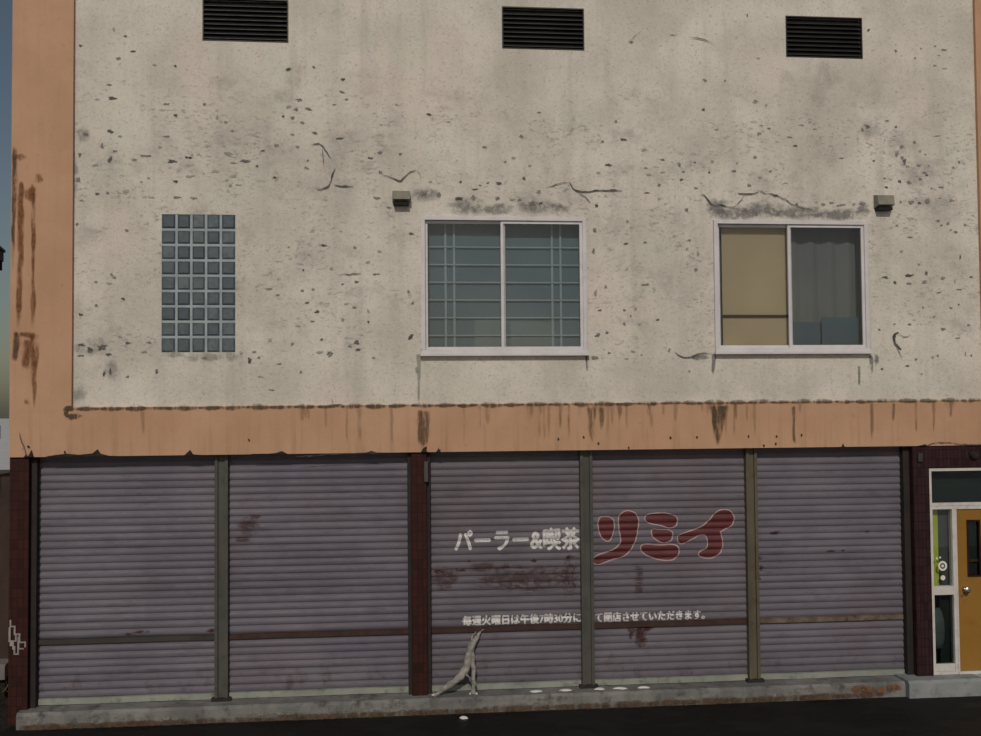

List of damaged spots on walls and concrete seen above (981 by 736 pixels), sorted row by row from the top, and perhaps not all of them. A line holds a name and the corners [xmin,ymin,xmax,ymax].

crack [311,143,353,190]
water stain [457,203,503,213]
crack [545,182,622,202]
crack [702,190,809,209]
water stain [709,201,869,220]
corrosion [16,176,42,316]
corrosion [20,333,38,399]